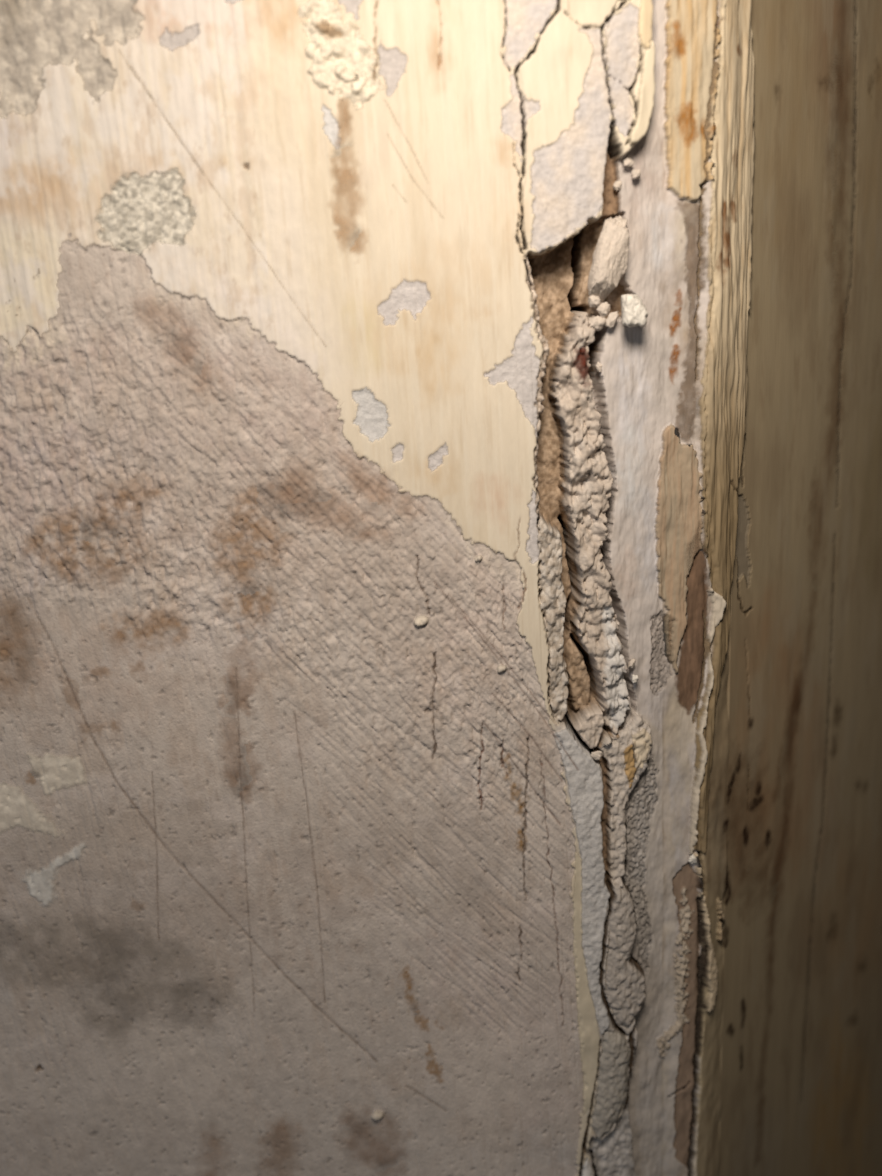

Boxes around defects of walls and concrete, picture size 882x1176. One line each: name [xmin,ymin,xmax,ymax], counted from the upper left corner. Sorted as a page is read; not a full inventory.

peeling [0,0,659,1176]
crack [502,0,641,286]
crack [579,747,643,1176]
peeling [649,0,755,1166]